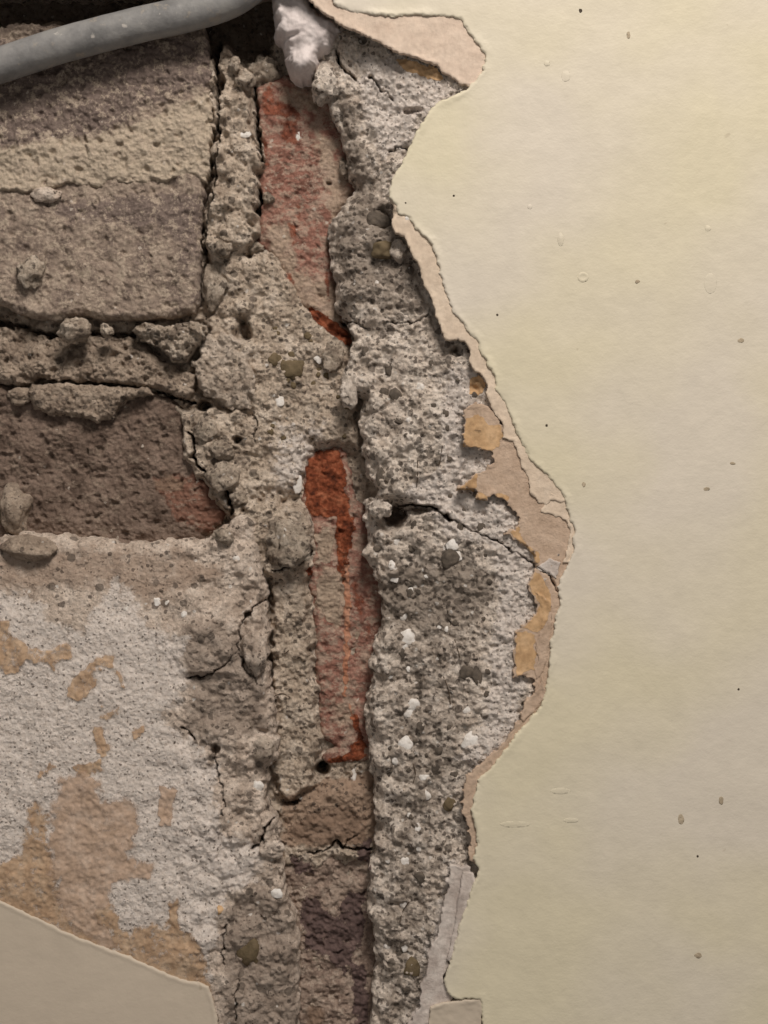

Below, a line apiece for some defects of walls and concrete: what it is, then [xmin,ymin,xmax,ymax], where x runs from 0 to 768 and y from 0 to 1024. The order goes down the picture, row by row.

crack [214,52,222,183]
corrosion [262,86,300,144]
corrosion [308,307,352,346]
peeling [27,382,155,424]
crack [157,392,197,405]
spalling [310,2,547,1024]
crack [398,503,556,588]
corrosion [304,449,367,763]
spalling [0,514,301,1024]
crack [252,799,300,848]